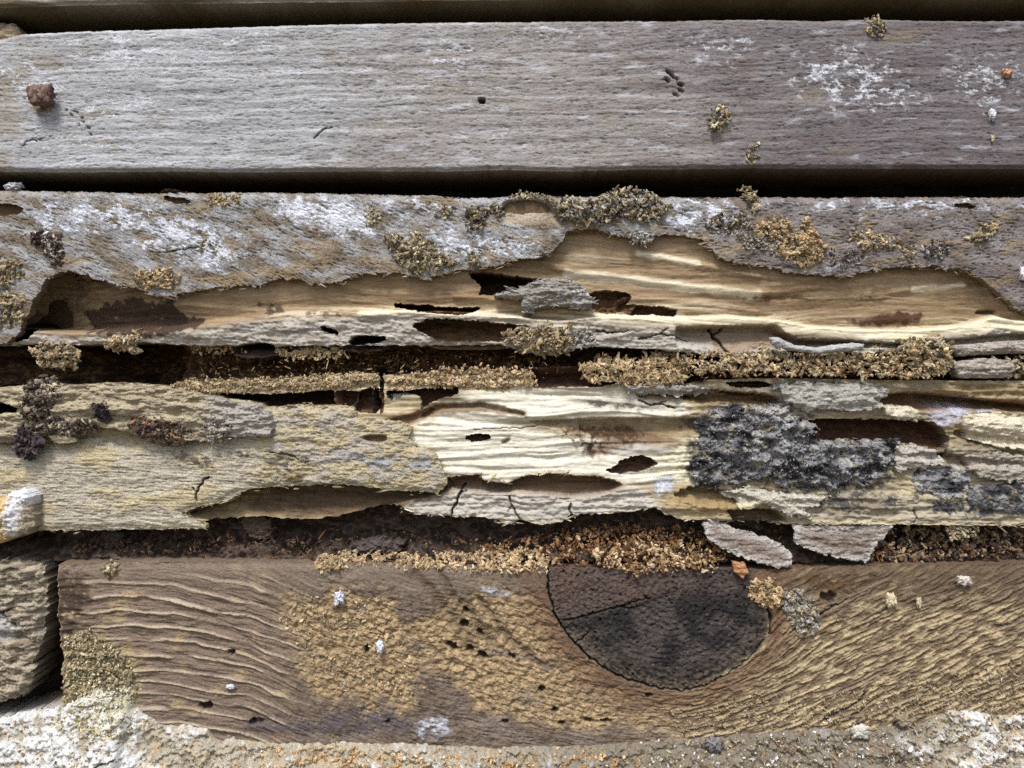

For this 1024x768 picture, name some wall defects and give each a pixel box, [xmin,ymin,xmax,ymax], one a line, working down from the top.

peeling [494,277,599,315]
peeling [625,383,714,398]
peeling [770,380,919,422]
peeling [893,443,945,473]